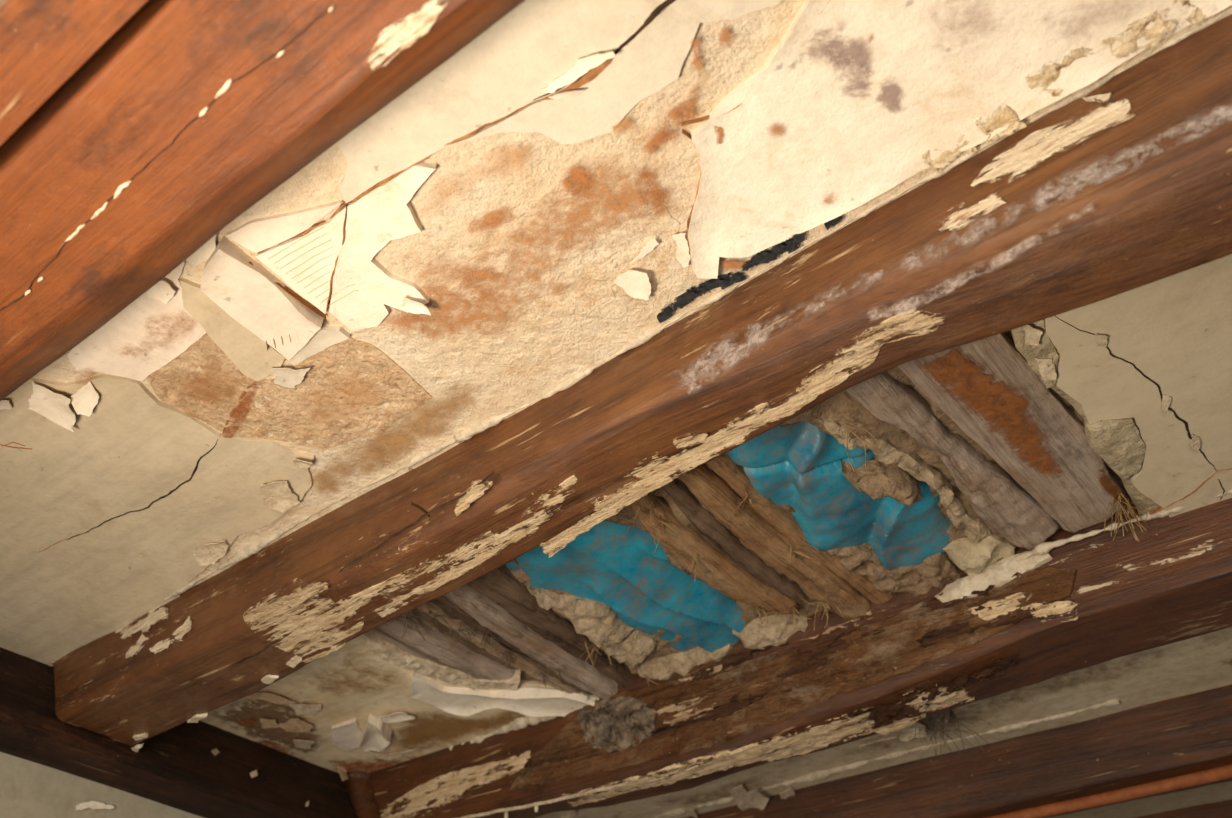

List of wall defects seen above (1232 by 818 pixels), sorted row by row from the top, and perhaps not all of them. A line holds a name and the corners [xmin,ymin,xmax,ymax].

leakage [811,31,900,111]
crack [0,5,334,311]
peeling [179,0,1232,390]
crack [38,386,251,553]
peeling [0,234,432,667]
peeling [187,275,974,760]
spalling [1087,418,1146,481]
crack [1055,316,1232,514]
peeling [1071,539,1232,596]
peeling [131,733,149,753]
peeling [380,750,531,818]
peeling [459,685,975,818]